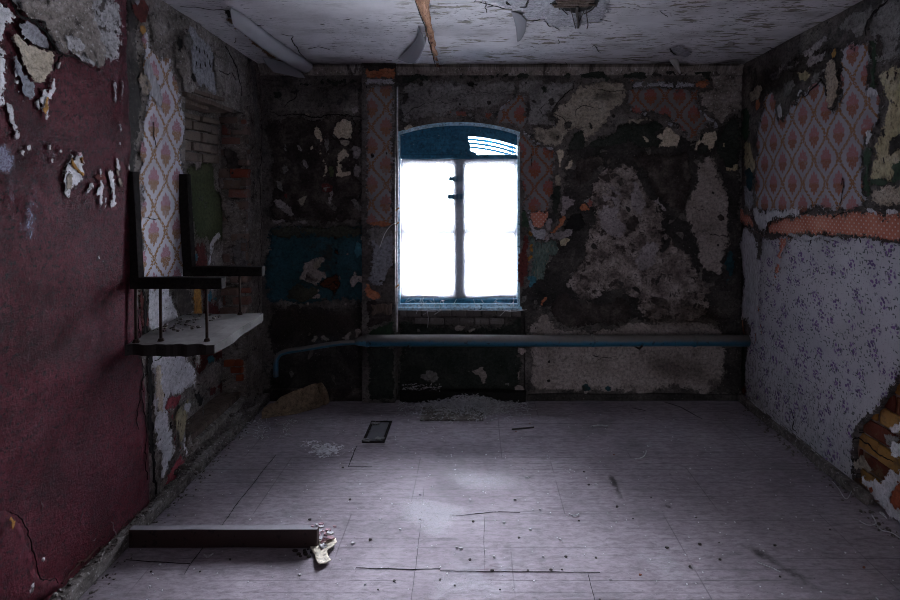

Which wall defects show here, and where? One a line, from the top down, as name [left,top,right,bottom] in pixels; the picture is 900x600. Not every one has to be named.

peeling [0,0,216,208]
peeling [769,36,836,97]
peeling [839,0,900,207]
peeling [185,108,251,277]
flaking render [264,71,763,401]
peeling [151,355,204,491]
flaking render [853,383,900,523]